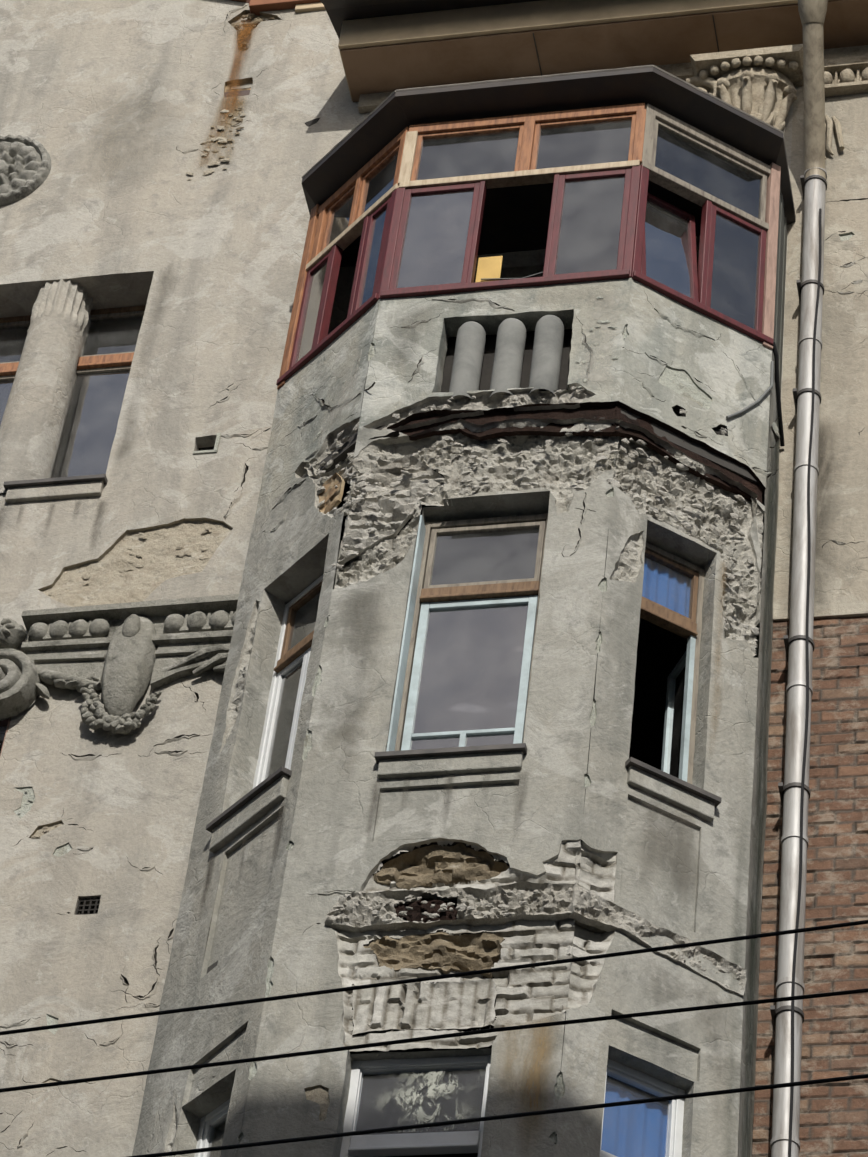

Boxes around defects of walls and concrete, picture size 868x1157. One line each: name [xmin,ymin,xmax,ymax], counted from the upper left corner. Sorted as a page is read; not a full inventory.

spalling [228,10,282,51]
spalling [186,77,253,180]
crack [826,231,868,298]
crack [622,347,713,402]
crack [644,291,780,478]
spalling [294,296,764,658]
flaking render [38,517,233,607]
crack [562,492,596,557]
crack [84,920,175,1047]
spalling [263,956,274,1003]
flaking render [327,838,618,1053]
crack [0,1111,86,1155]